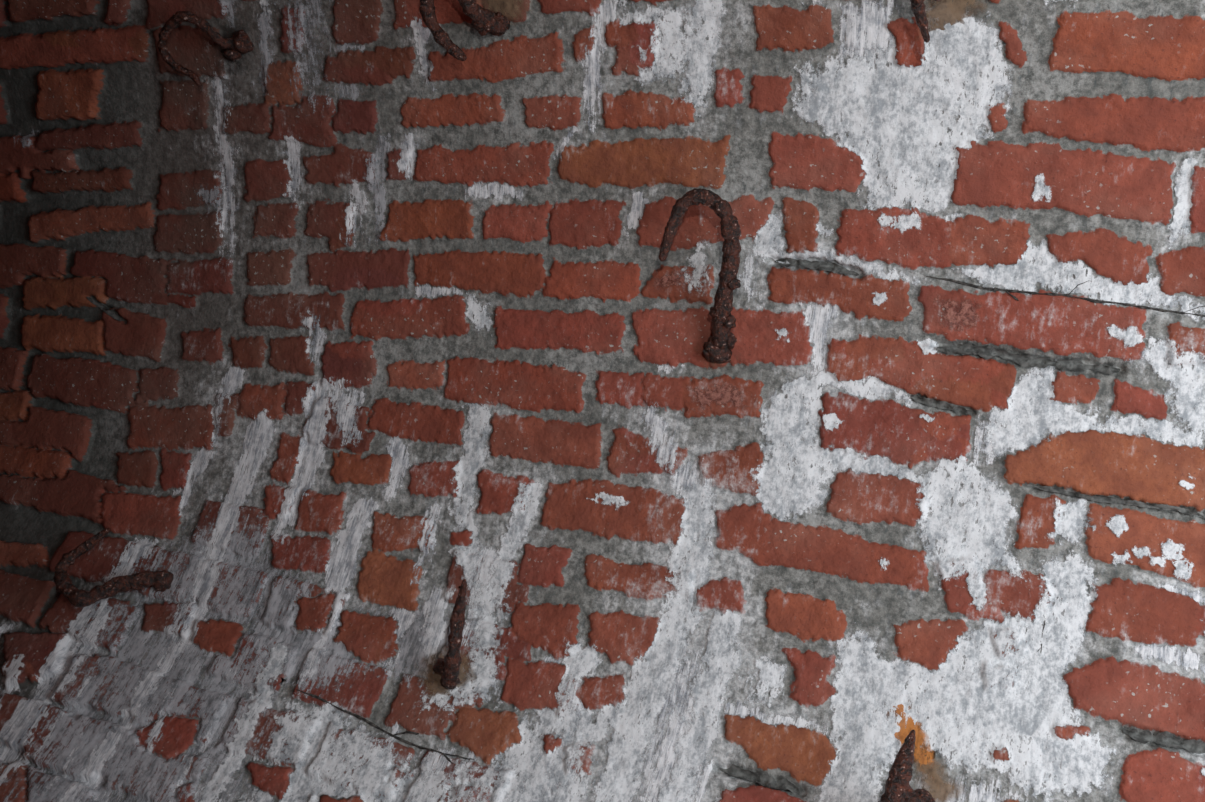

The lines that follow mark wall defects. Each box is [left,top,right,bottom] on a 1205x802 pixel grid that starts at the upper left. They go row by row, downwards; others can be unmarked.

corrosion [925,0,982,32]
damp [197,0,243,263]
damp [791,0,1012,233]
damp [339,129,419,248]
damp [465,182,523,201]
damp [1167,157,1199,249]
damp [411,282,494,336]
crack [927,276,1205,317]
damp [953,239,1205,324]
damp [0,302,1205,802]
corrosion [423,648,475,696]
corrosion [890,704,958,802]